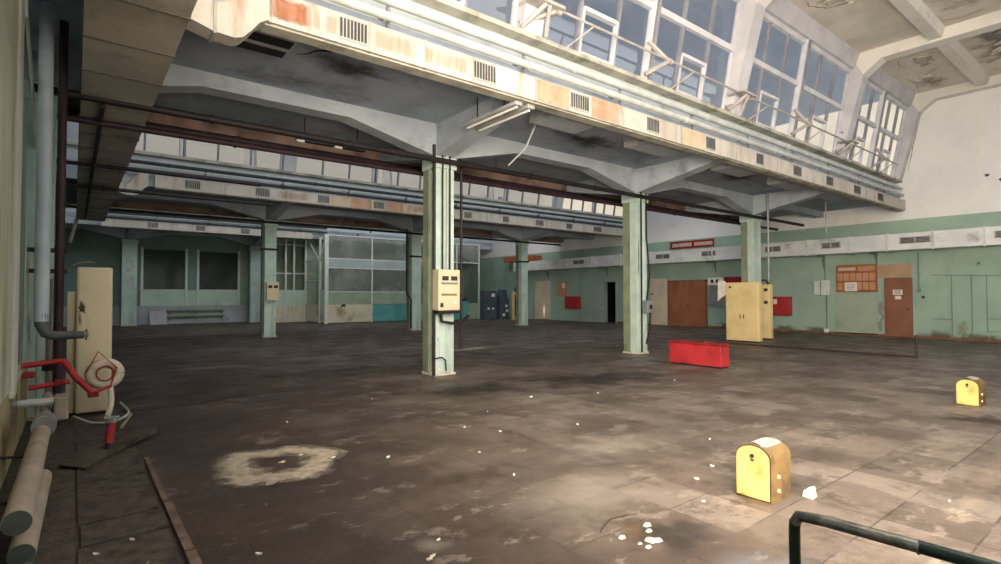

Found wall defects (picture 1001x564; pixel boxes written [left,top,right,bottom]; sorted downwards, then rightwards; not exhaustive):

peeling [971,28,1001,69]